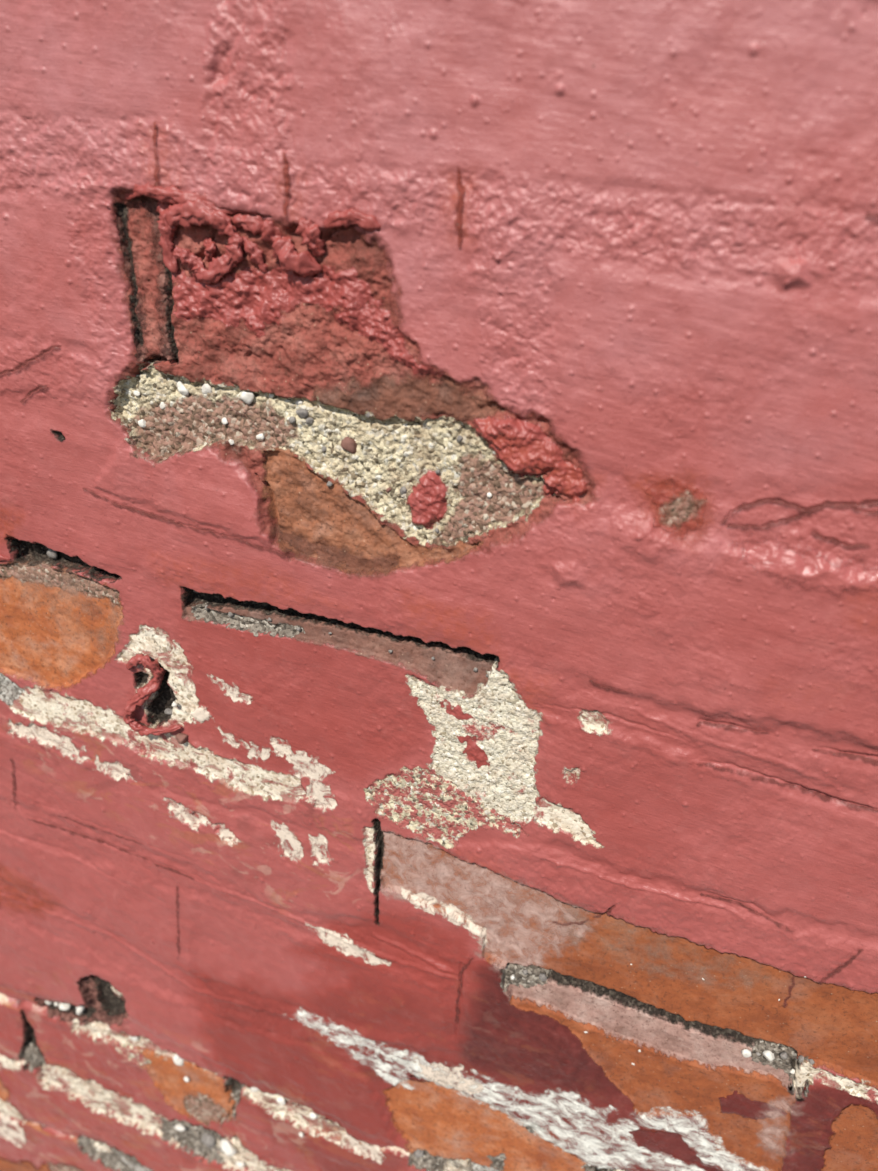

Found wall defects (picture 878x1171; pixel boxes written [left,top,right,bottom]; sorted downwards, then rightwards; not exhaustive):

spalling [108,183,595,576]
crack [722,499,878,549]
spalling [0,536,338,811]
crack [181,587,500,698]
peeling [164,797,240,847]
peeling [271,820,331,866]
crack [363,819,385,925]
peeling [364,658,878,1171]
peeling [0,1055,82,1171]
peeling [115,1040,236,1125]
crack [456,962,470,1023]
crack [500,963,815,1097]